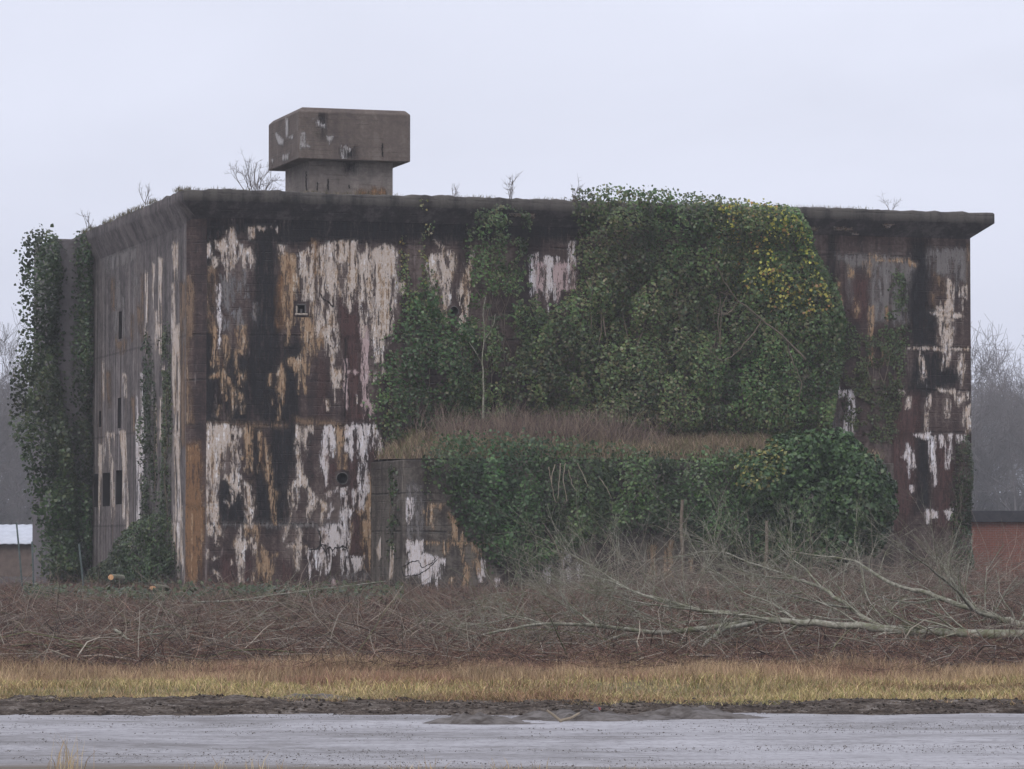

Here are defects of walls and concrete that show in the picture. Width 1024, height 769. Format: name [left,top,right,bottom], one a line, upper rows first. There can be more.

peeling [206,423,278,586]
rust [179,264,377,587]
peeling [207,226,405,411]
peeling [287,421,383,579]
damp [206,218,578,556]
peeling [406,539,446,589]
peeling [406,497,467,563]
peeling [424,242,474,350]
peeling [528,241,576,313]
peeling [838,387,856,433]
damp [827,235,971,524]
peeling [908,278,969,371]